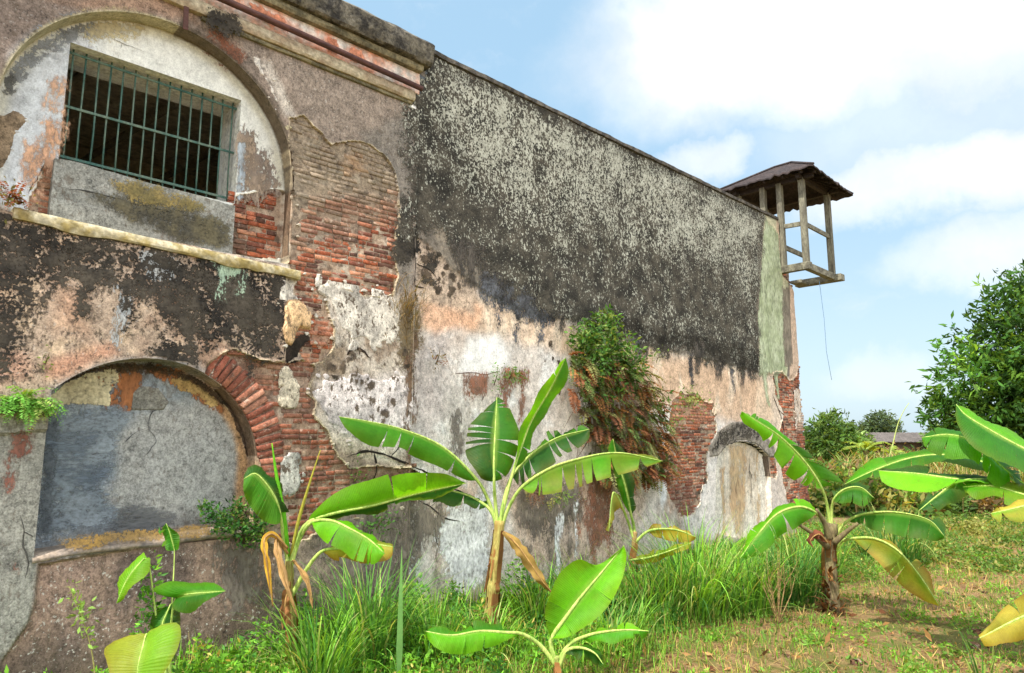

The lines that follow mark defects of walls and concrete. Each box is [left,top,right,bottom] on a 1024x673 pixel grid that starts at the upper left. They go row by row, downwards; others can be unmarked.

peeling [0,111,29,168]
flaking render [29,166,52,214]
flaking render [50,369,119,406]
leakage [0,192,292,405]
flaking render [170,117,427,545]
leakage [390,228,567,345]
flaking render [663,391,716,517]
leakage [688,287,793,407]
flaking render [768,366,810,504]